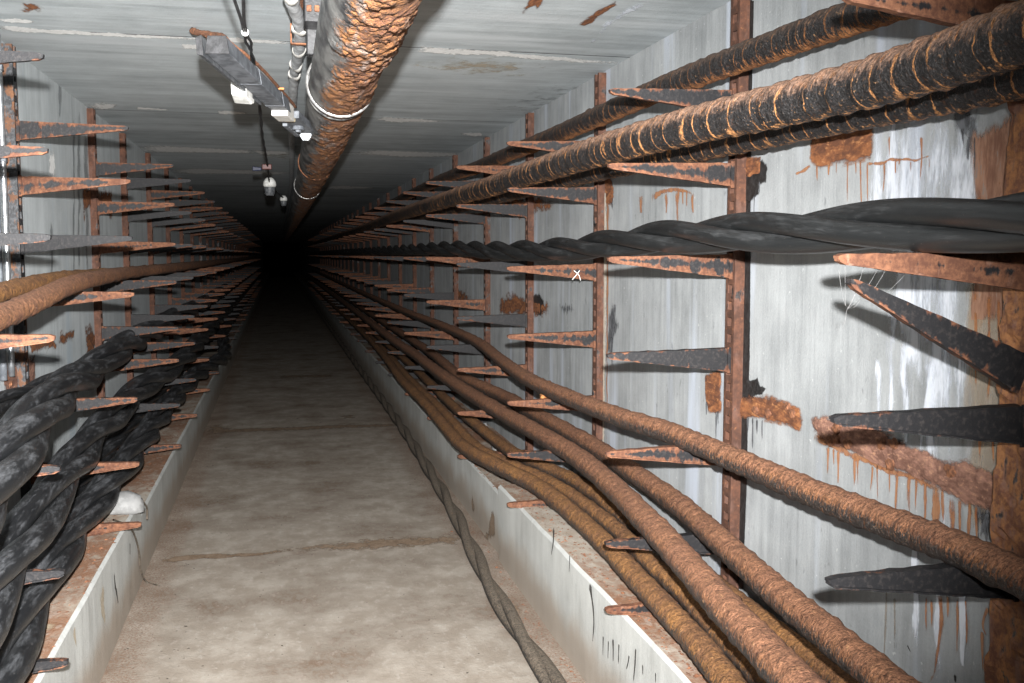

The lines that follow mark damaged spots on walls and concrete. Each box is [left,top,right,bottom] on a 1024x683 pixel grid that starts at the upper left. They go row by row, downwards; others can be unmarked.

rust [581,3,616,26]
rust [796,129,873,202]
rust [972,115,1011,199]
rust [654,188,694,220]
rust [500,292,548,317]
rust [969,283,1003,342]
rust [705,371,722,433]
rust [740,396,802,448]